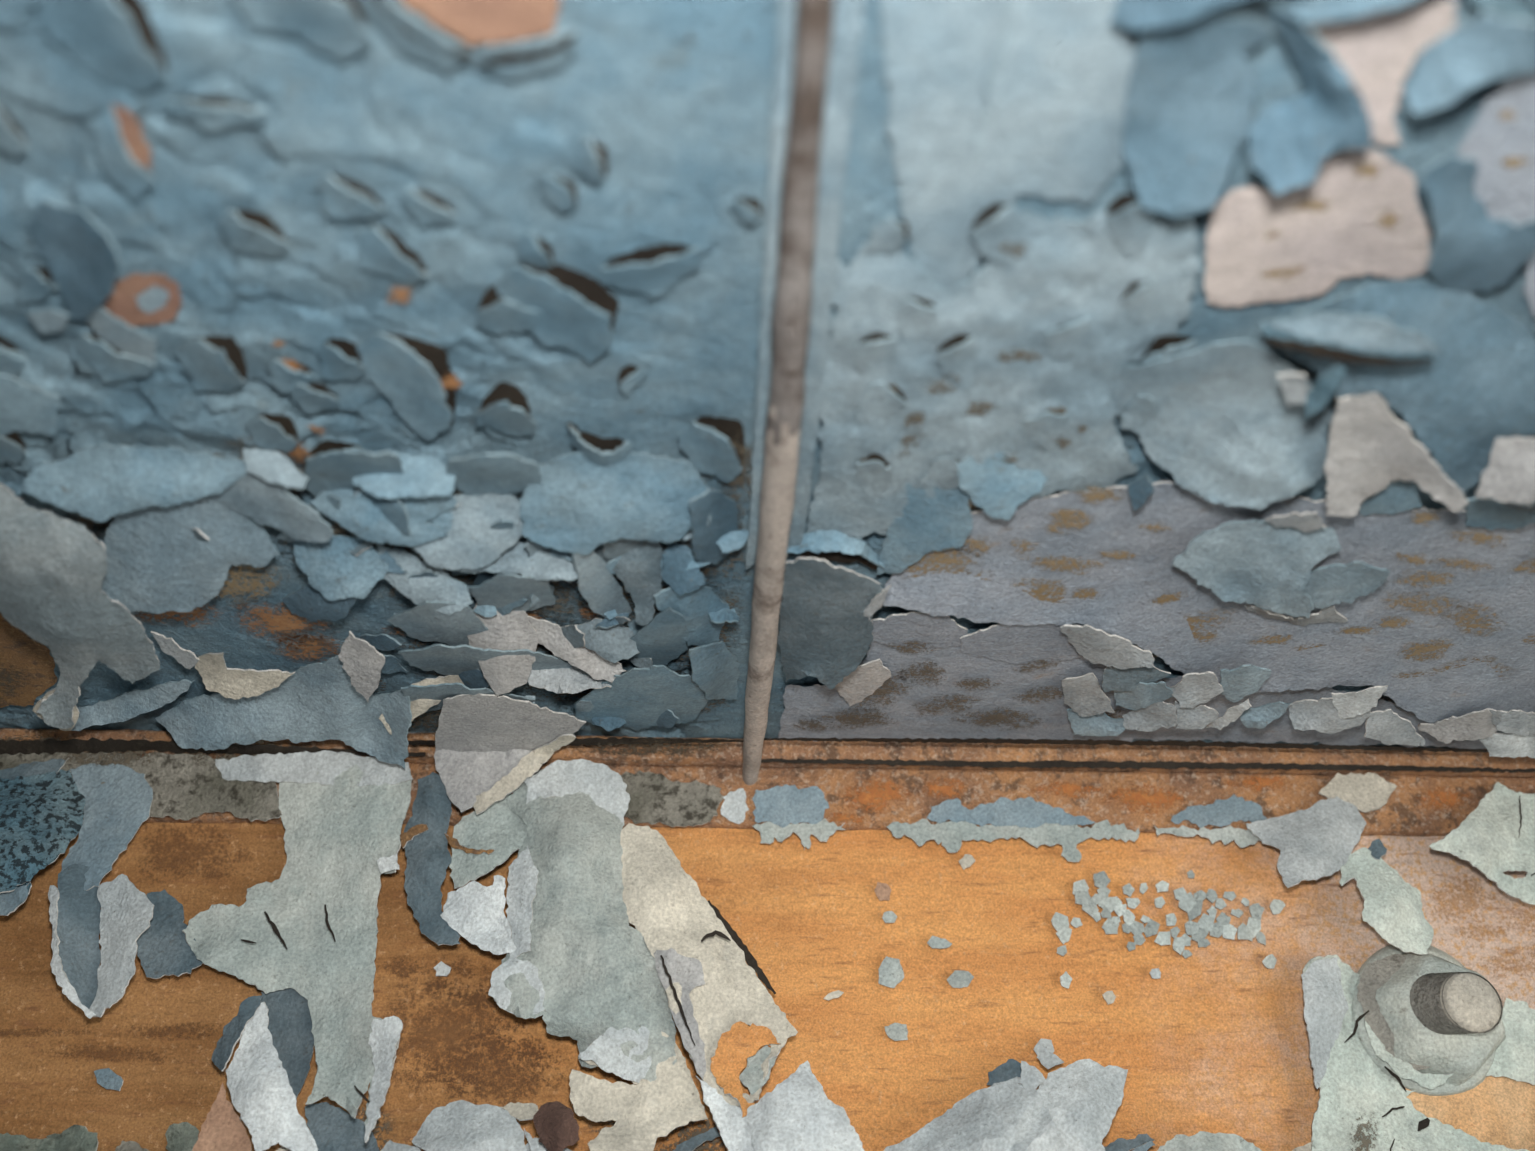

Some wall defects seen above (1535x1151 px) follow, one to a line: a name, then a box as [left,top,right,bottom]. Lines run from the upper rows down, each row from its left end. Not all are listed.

peeling [16,198,247,392]
peeling [778,0,1535,758]
rust [906,535,989,581]
rust [1011,487,1136,603]
rust [1153,591,1227,642]
rust [1342,530,1508,679]
peeling [0,332,865,1151]
rust [828,775,964,825]
peeling [1051,772,1434,989]
peeling [1429,782,1535,905]
peeling [884,1039,1262,1151]
peeling [1292,955,1535,1151]